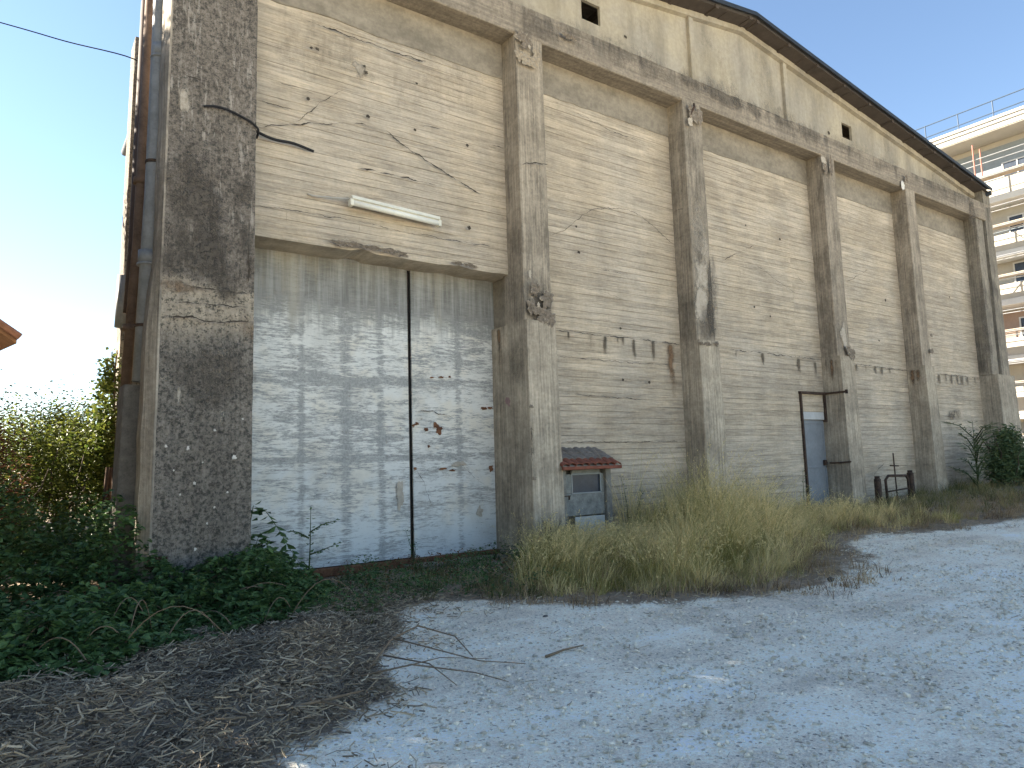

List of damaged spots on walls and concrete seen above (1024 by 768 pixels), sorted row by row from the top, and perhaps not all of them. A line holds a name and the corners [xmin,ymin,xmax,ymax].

spalling [514,29,541,68]
crack [261,82,478,193]
spalling [330,238,409,257]
crack [167,246,251,323]
spalling [526,270,556,328]